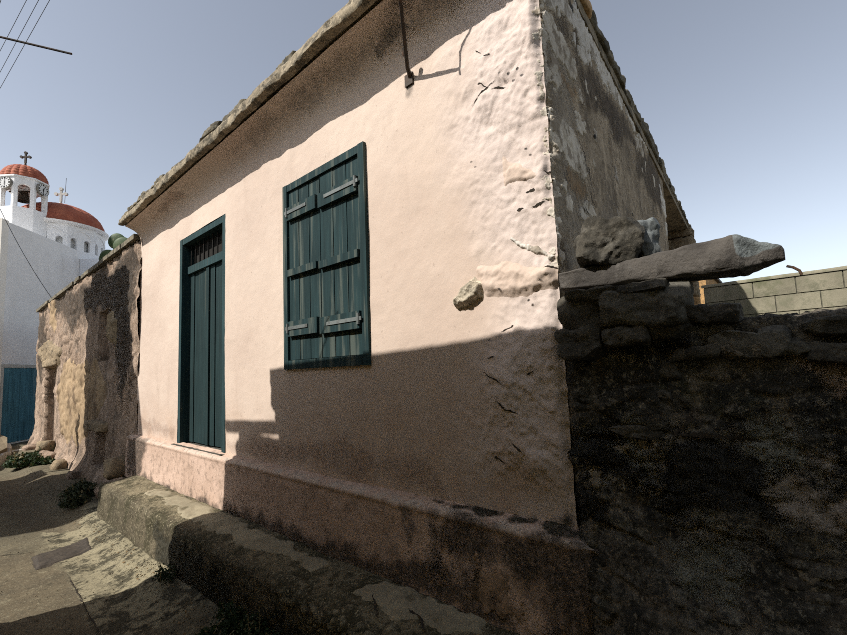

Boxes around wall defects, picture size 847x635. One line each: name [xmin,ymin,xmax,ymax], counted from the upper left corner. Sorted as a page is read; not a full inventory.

peeling [510,0,668,273]
damp [548,45,662,210]
damp [554,156,583,268]
damp [126,437,151,481]
damp [197,497,505,625]
damp [439,512,599,635]